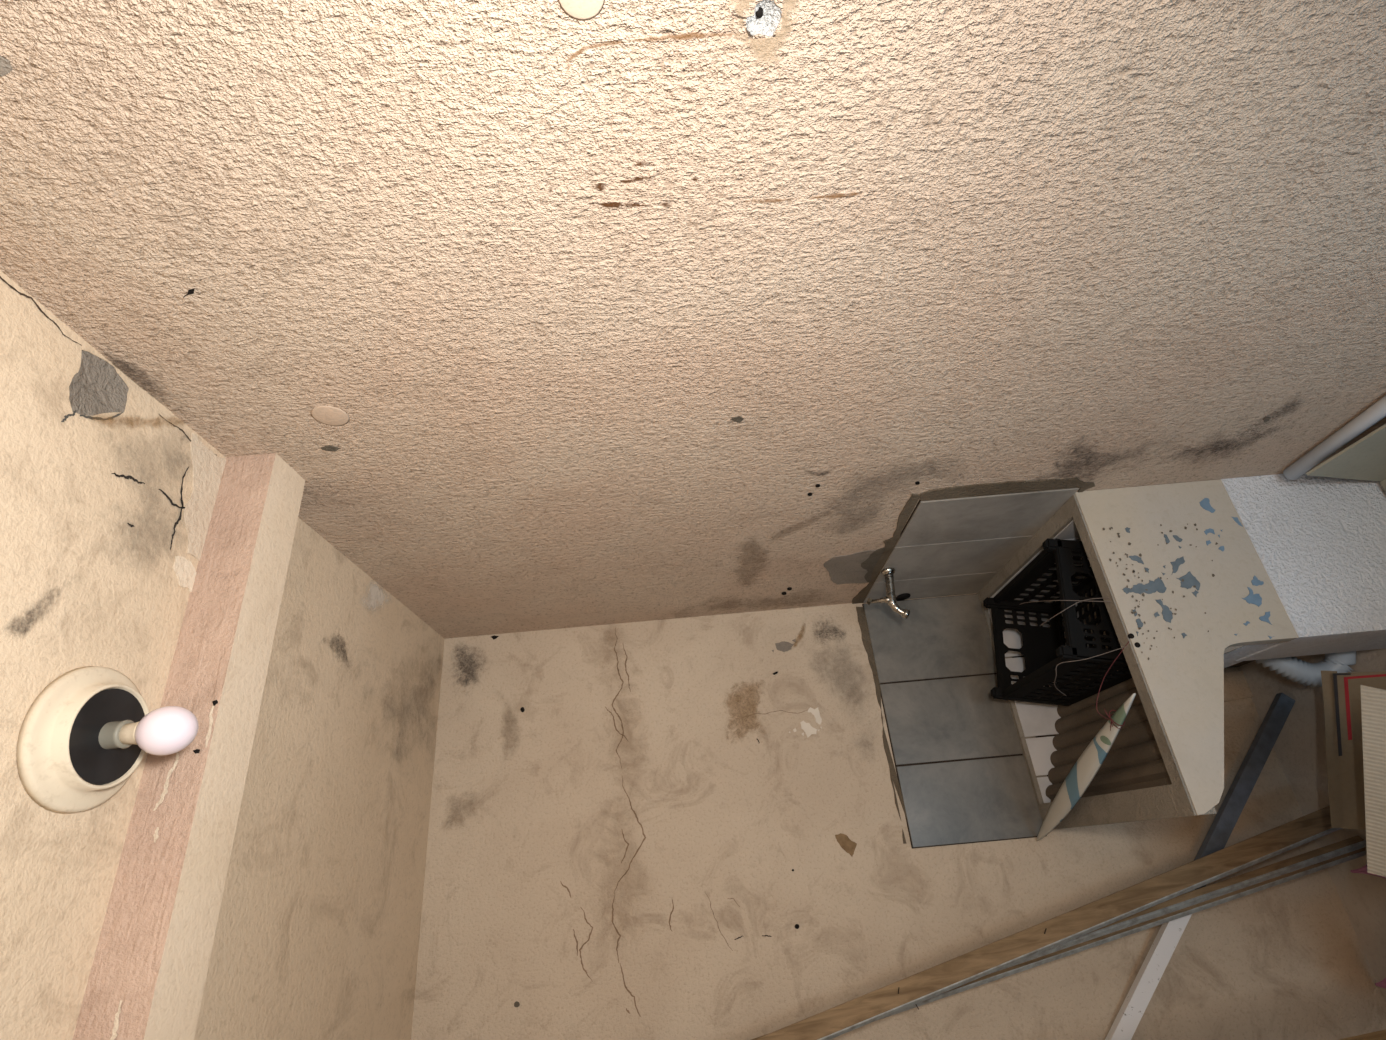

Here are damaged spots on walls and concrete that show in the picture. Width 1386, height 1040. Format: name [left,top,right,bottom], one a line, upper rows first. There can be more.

spalling [746,0,782,37]
crack [0,276,82,346]
crack [61,410,123,422]
spalling [69,350,129,416]
crack [112,414,216,550]
crack [560,628,646,1017]